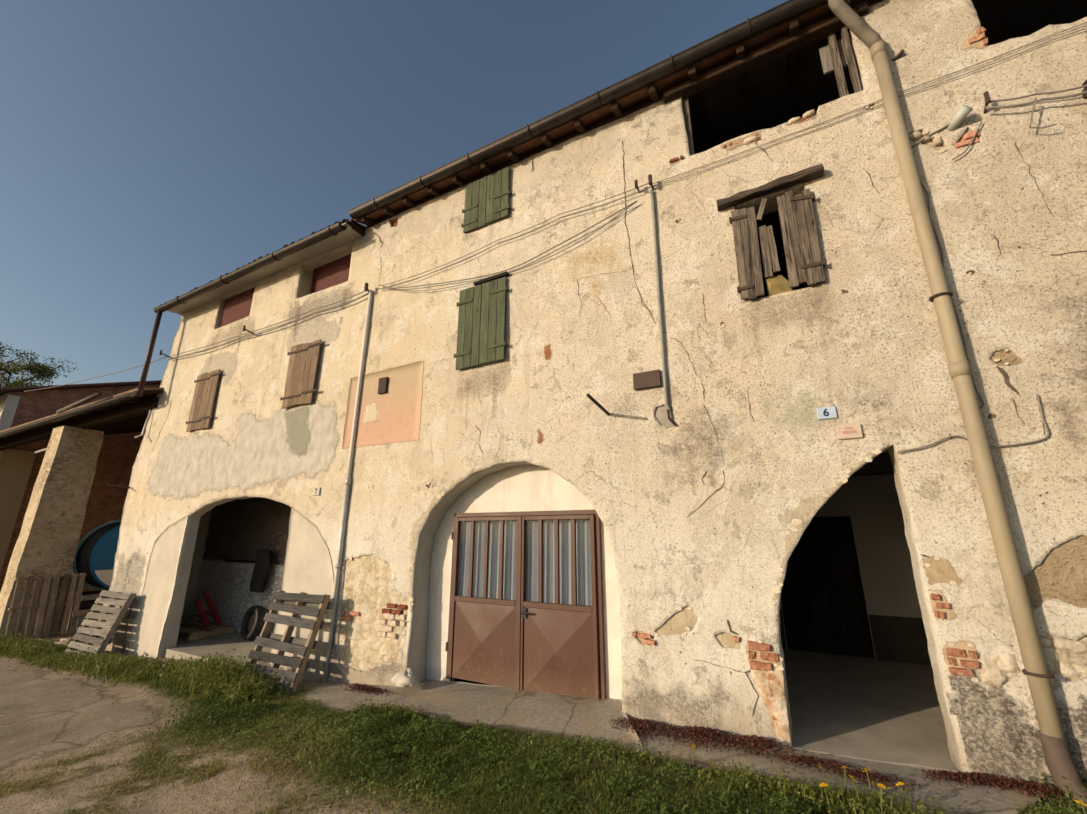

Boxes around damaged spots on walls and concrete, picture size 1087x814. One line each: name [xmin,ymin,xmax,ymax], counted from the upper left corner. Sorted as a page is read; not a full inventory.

crack [577,141,725,518]
flaking render [990,349,1023,368]
flaking render [338,481,454,671]
flaking render [632,605,698,645]
flaking render [715,632,791,747]
flaking render [922,556,962,620]
flaking render [1023,535,1087,610]
flaking render [1039,635,1087,681]